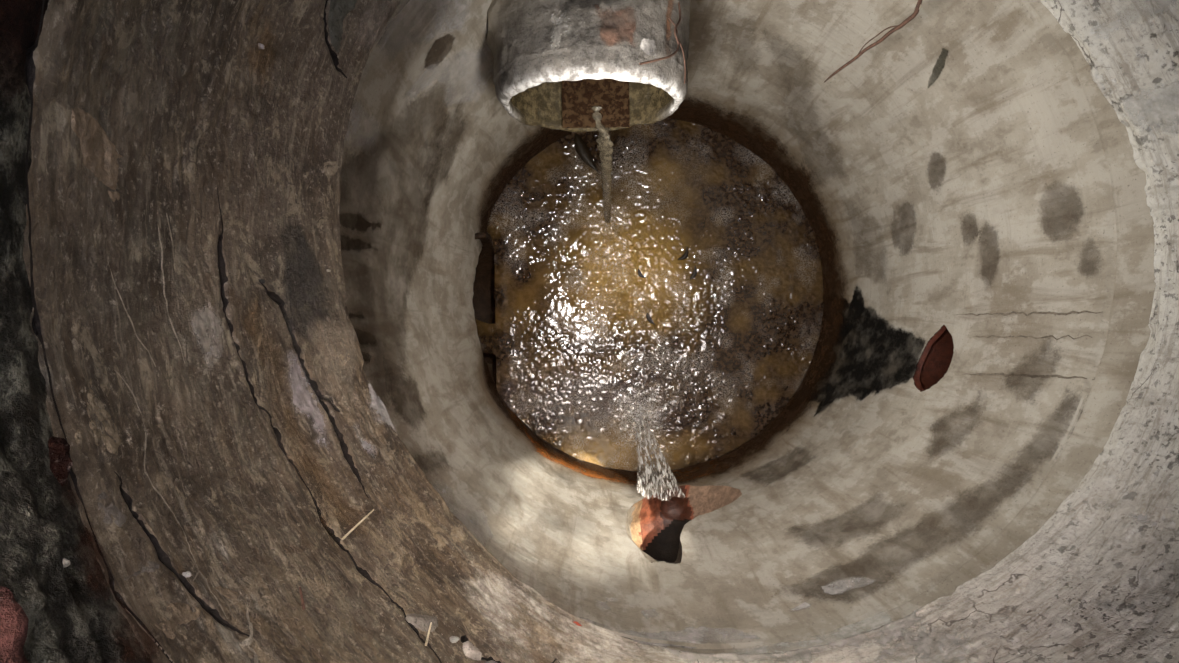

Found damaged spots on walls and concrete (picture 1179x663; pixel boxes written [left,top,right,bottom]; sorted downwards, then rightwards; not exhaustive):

crack [323,0,347,78]
water stain [551,14,570,48]
water stain [570,0,612,9]
water stain [640,38,655,51]
water stain [480,97,925,486]
crack [217,188,501,663]
crack [114,371,258,663]
water stain [792,557,891,610]
spalling [462,641,482,660]